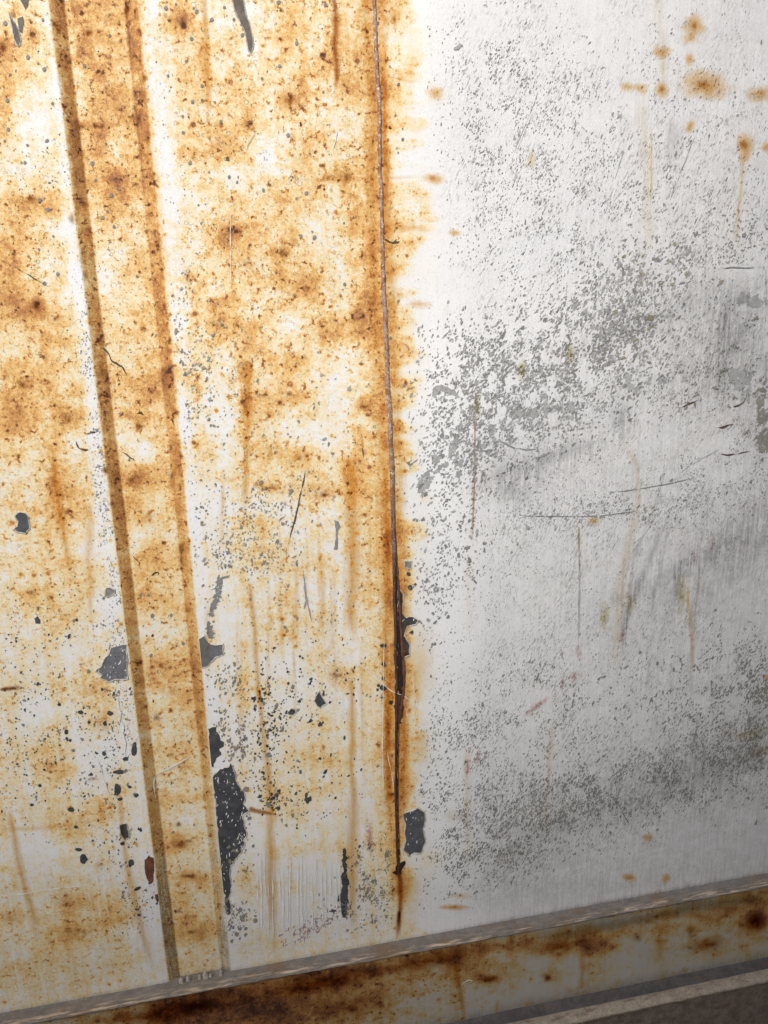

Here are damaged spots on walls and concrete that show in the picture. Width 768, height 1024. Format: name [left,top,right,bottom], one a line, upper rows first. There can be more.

spalling [2,110,168,547]
peeling [144,0,768,947]
peeling [0,557,185,937]